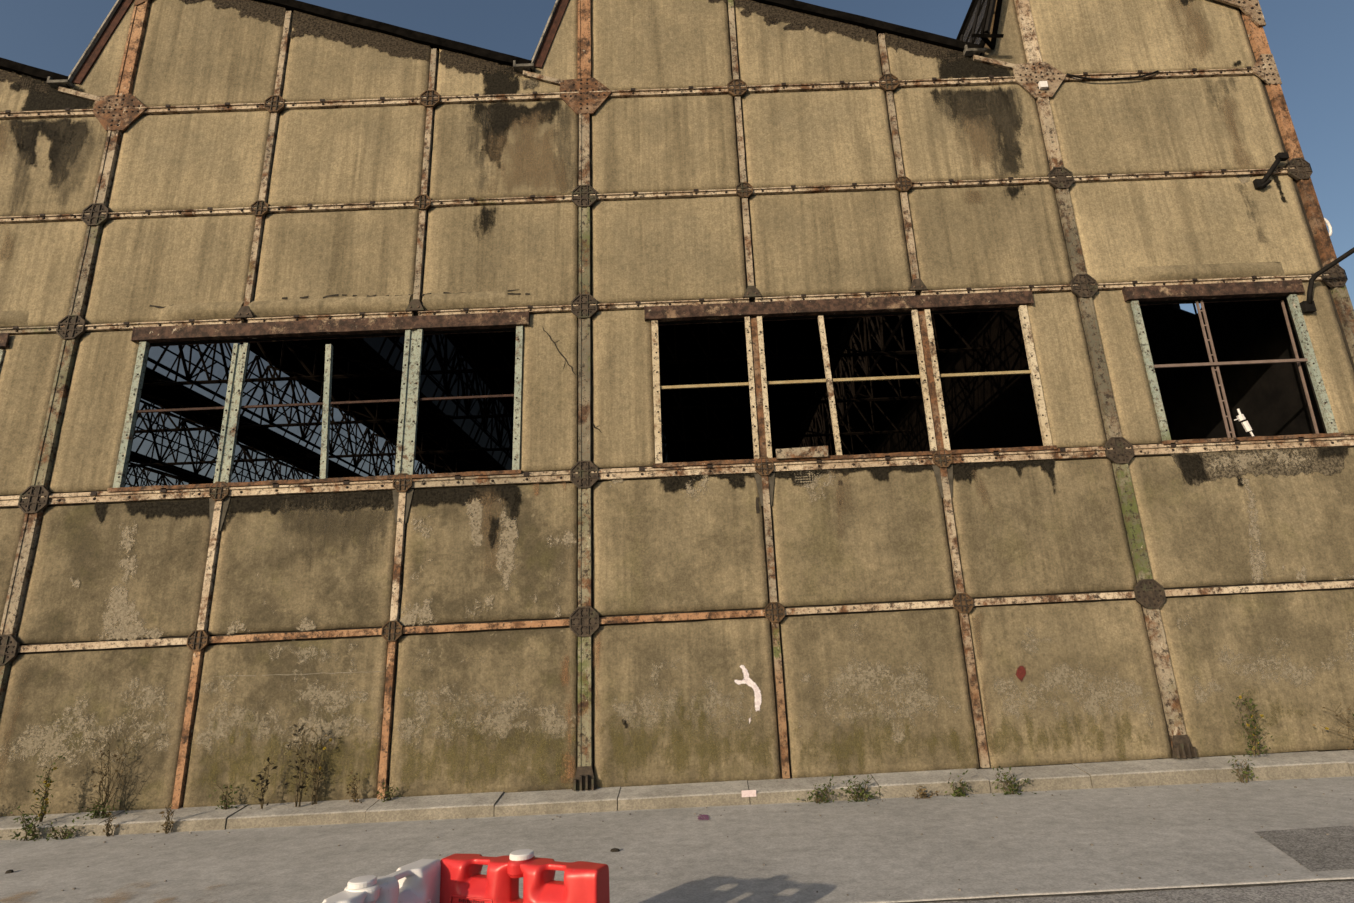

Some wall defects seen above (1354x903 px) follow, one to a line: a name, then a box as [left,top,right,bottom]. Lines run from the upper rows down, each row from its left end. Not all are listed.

leakage [0,75,94,213]
leakage [469,66,573,190]
leakage [931,50,1025,199]
leakage [474,205,496,237]